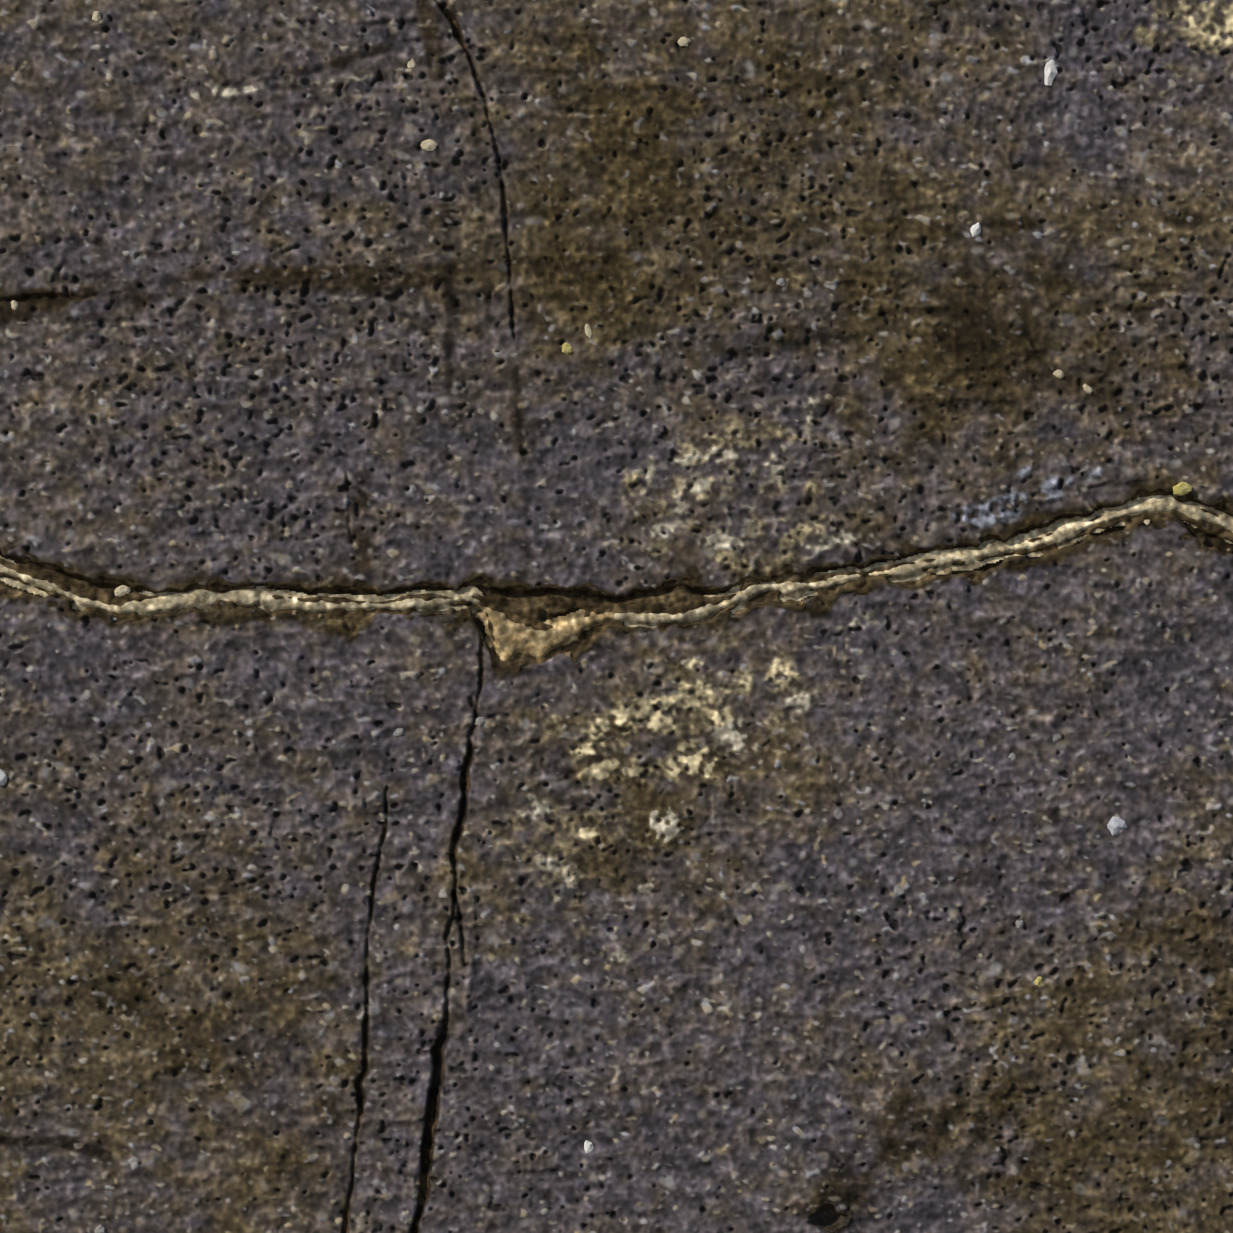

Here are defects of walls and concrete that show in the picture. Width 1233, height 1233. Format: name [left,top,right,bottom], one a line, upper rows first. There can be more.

crack [436,2,493,134]
crack [501,180,515,332]
leakage [570,659,811,812]
leakage [517,795,680,906]
crack [0,477,1233,1233]
leakage [614,952,630,962]